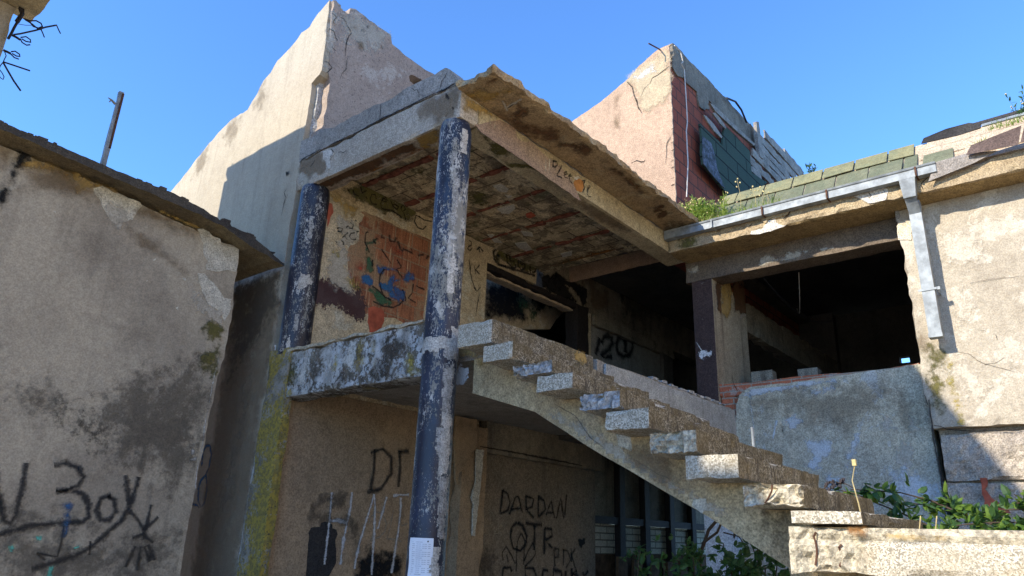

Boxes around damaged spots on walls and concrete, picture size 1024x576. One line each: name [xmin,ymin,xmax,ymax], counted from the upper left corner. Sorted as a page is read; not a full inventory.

leakage [464,79,592,171]
peeling [93,186,142,229]
peeling [306,203,334,244]
leakage [580,203,626,230]
peeling [182,229,239,324]
spalling [298,211,431,332]
leakage [192,272,280,576]
peeling [422,326,469,576]